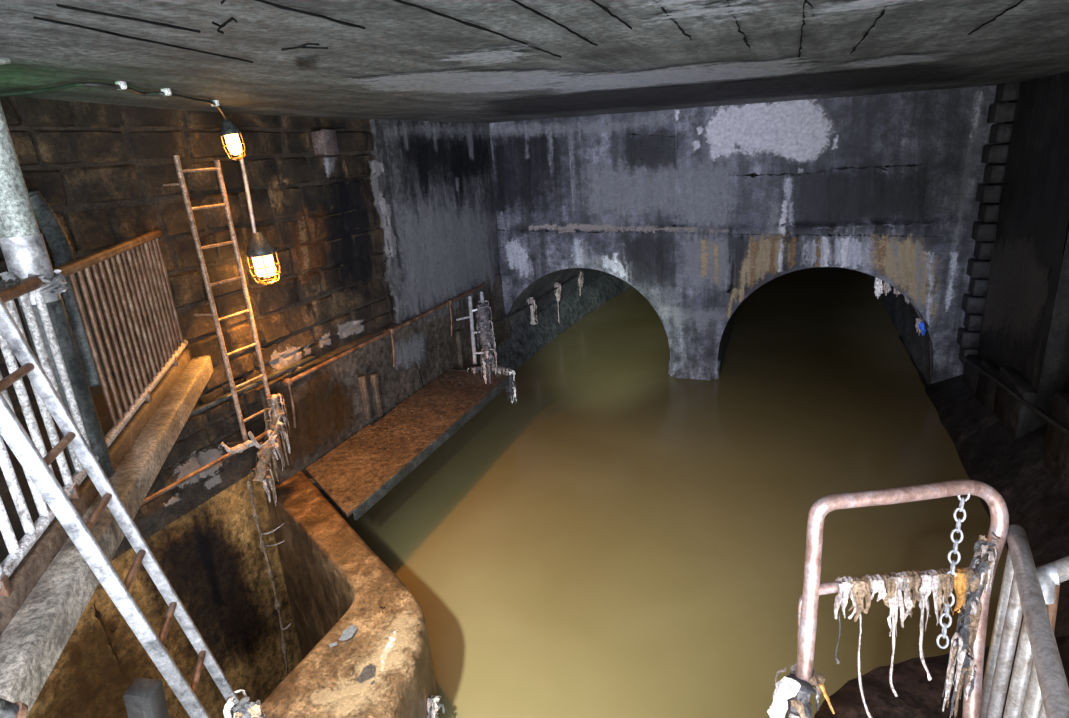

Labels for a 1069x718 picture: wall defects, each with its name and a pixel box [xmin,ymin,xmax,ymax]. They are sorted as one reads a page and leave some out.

crack [33,0,253,63]
crack [255,0,365,51]
crack [393,0,597,58]
crack [590,0,632,29]
crack [797,0,814,60]
crack [968,0,1024,35]
damp [969,90,983,159]
damp [386,110,750,315]
damp [768,168,930,269]
rust [727,234,797,318]
rust [868,234,938,326]
damp [945,211,961,311]